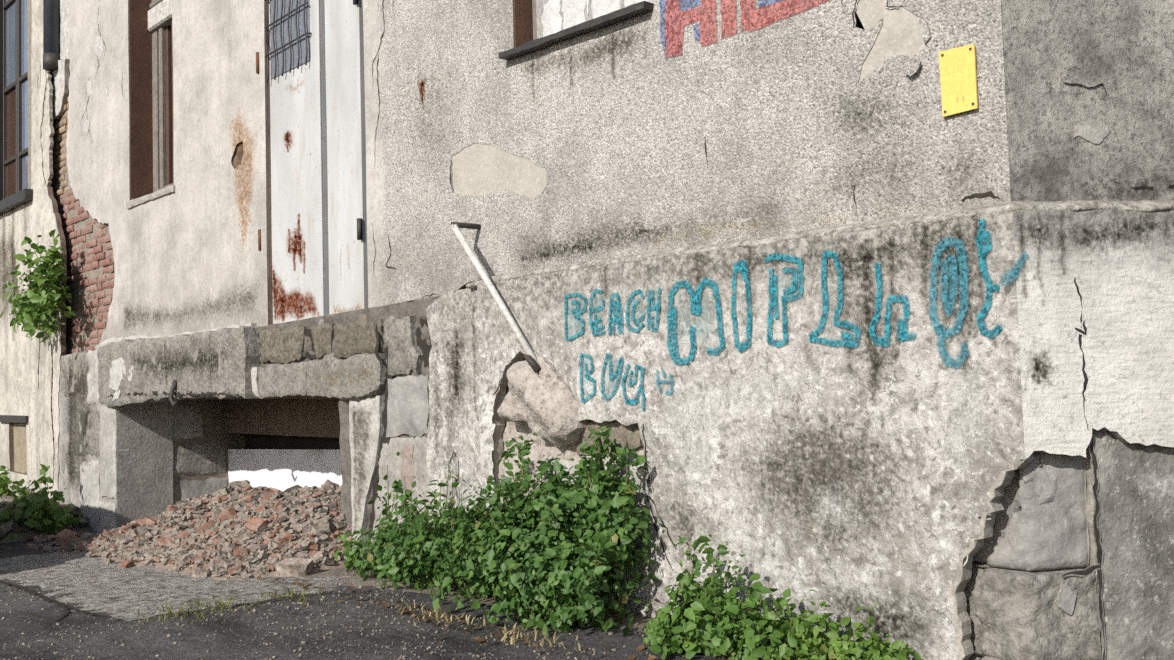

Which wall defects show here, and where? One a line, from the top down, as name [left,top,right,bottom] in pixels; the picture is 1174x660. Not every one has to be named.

peeling [851,0,932,82]
flaking render [27,0,115,355]
rust [288,214,305,272]
leakage [1073,221,1153,245]
rust [272,270,318,319]
spalling [497,352,651,553]
crack [1062,277,1107,660]
spalling [951,454,1058,660]
spalling [1057,583,1077,615]